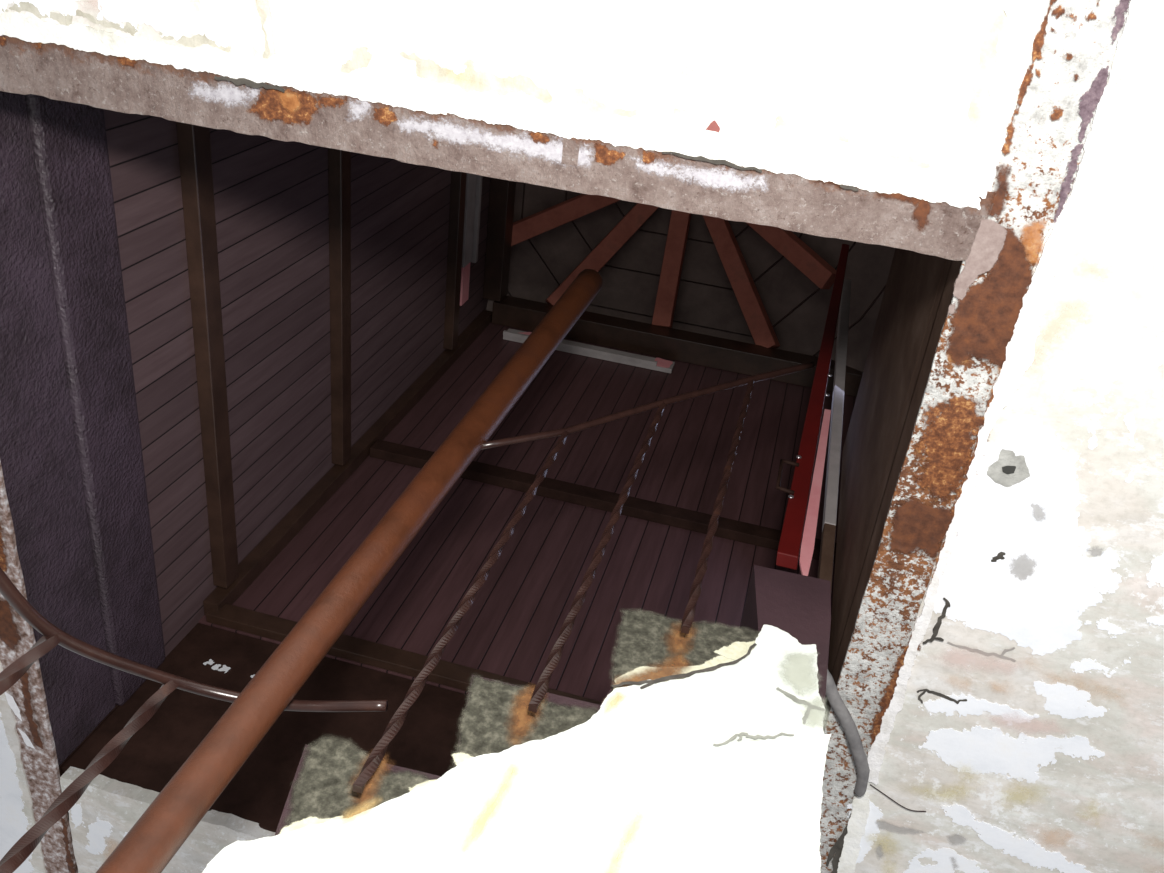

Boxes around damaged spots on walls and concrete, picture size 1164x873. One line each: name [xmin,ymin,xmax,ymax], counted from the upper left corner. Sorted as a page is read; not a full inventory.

rust [248,89,347,125]
rust [530,132,550,144]
rust [878,192,930,231]
rust [947,0,1099,373]
peeling [1054,66,1109,223]
rust [888,389,994,585]
peeling [934,417,1126,656]
spalling [453,676,597,768]
spalling [611,610,760,685]
rust [870,635,921,745]
peeling [918,657,1131,784]
spalling [286,737,432,827]